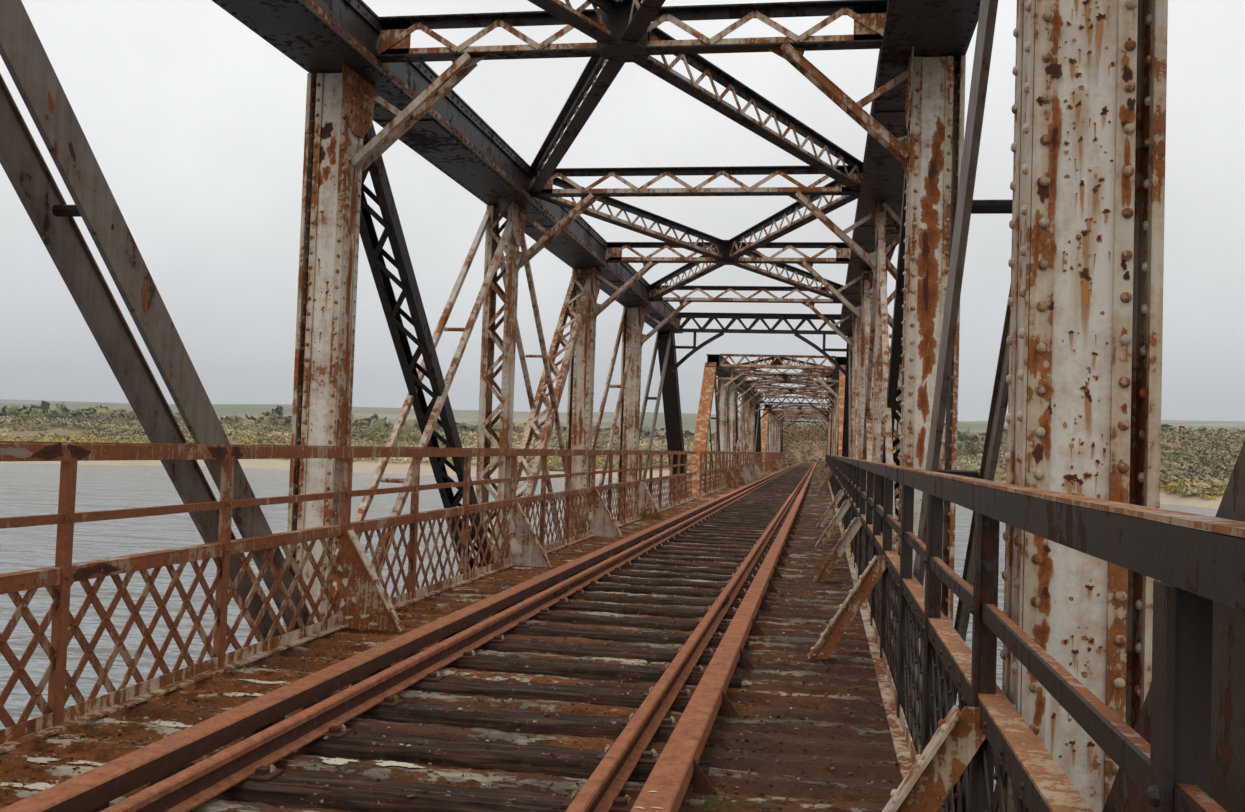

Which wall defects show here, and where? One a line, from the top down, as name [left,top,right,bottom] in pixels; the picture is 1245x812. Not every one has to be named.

peeling [1122,65,1133,82]
rust [319,121,336,187]
rust [1033,0,1136,352]
rust [341,166,356,445]
rust [916,341,936,467]
rust [1030,335,1108,463]
rust [31,442,91,460]
rust [209,446,243,461]
rust [1062,434,1125,503]
rust [73,563,118,582]